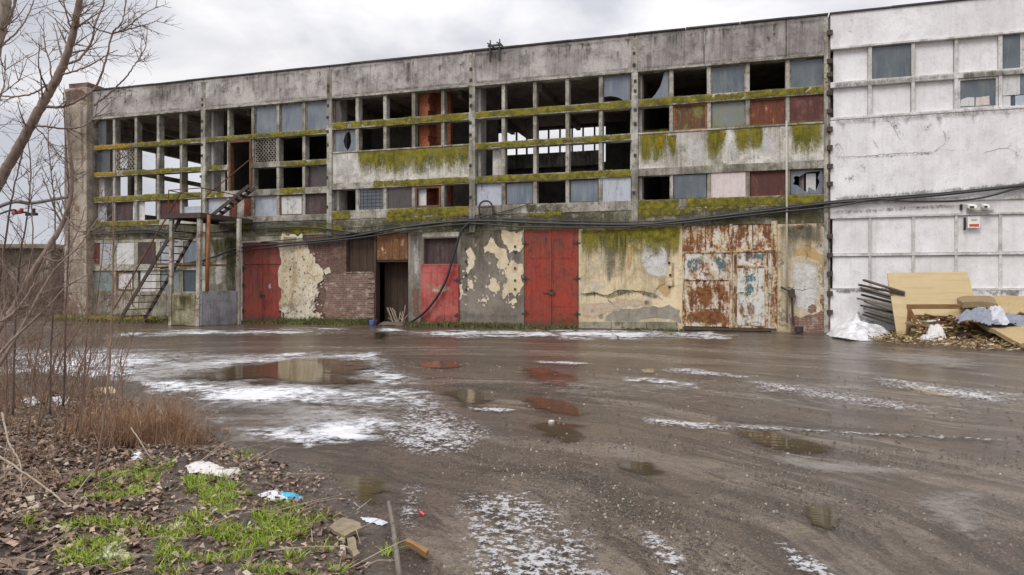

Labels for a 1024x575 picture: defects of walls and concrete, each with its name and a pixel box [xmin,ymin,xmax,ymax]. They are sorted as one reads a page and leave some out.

leakage [642,128,777,167]
leakage [793,126,812,148]
crack [838,121,949,161]
flaking render [268,233,331,320]
peeling [412,230,524,317]
leakage [574,233,675,280]
crack [580,255,679,302]
corrosion [689,272,726,324]